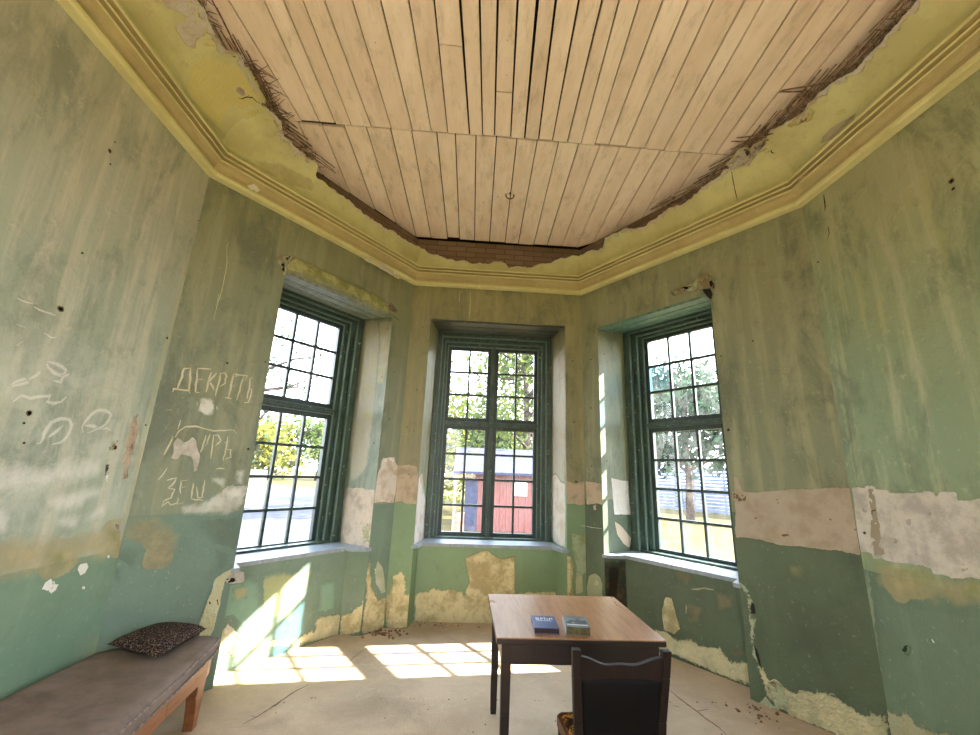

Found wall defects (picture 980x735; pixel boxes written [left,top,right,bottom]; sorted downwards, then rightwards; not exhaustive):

flaking render [162,0,922,270]
flaking render [670,271,716,300]
flaking render [99,413,139,483]
peeling [197,457,632,665]
peeling [732,475,980,582]
peeling [650,575,969,735]